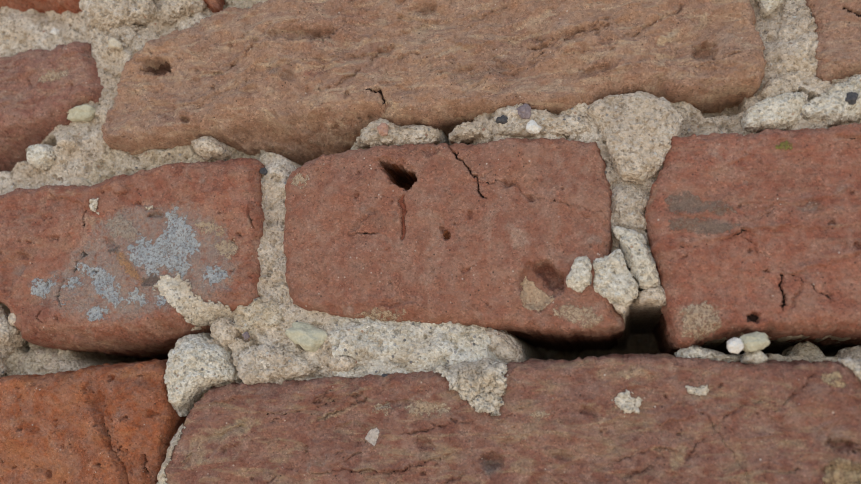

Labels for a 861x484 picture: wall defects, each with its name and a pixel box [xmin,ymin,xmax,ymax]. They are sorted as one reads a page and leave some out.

water stain [31,207,238,322]
spalling [520,276,555,312]